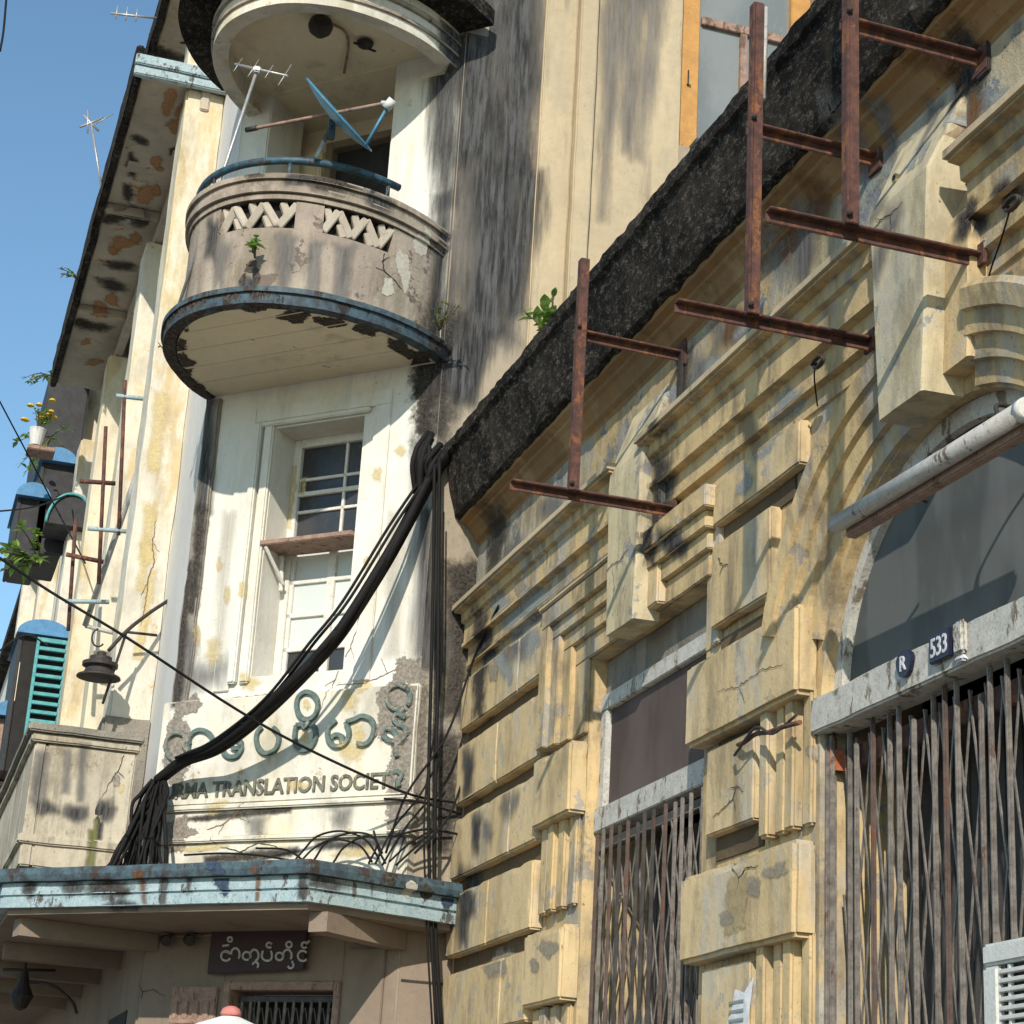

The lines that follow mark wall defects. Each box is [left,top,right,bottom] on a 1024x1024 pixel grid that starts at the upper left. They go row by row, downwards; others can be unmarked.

peeling [162,89,183,134]
corrosion [900,51,985,137]
leakage [411,0,543,445]
peeling [161,260,430,407]
crack [141,520,158,622]
crack [718,665,781,700]
peeling [162,692,203,791]
peeling [340,656,457,843]
corrosion [134,871,146,903]
peeling [163,814,230,896]
leakage [455,867,481,944]
leakage [472,813,481,853]